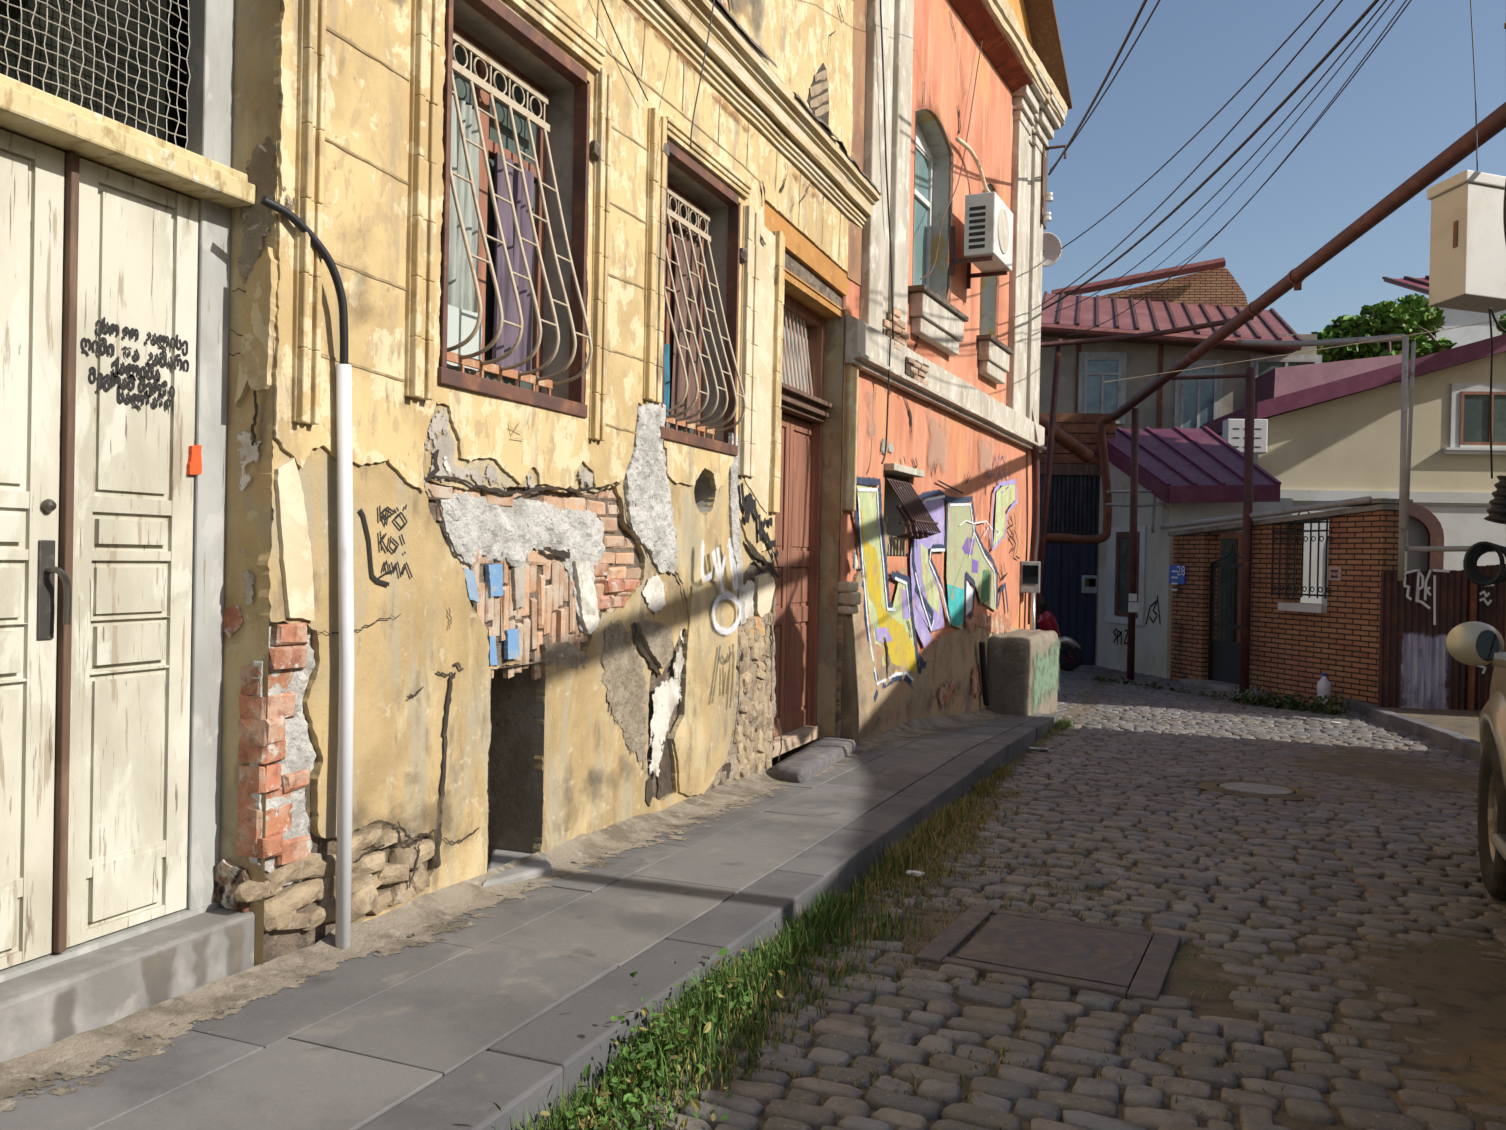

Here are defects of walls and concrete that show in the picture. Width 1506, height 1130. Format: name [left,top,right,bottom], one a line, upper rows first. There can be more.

peeling [234,137,297,408]
peeling [236,430,261,492]
flaking render [213,458,437,931]
crack [318,614,401,634]
crack [356,609,480,888]
flaking render [424,407,684,777]